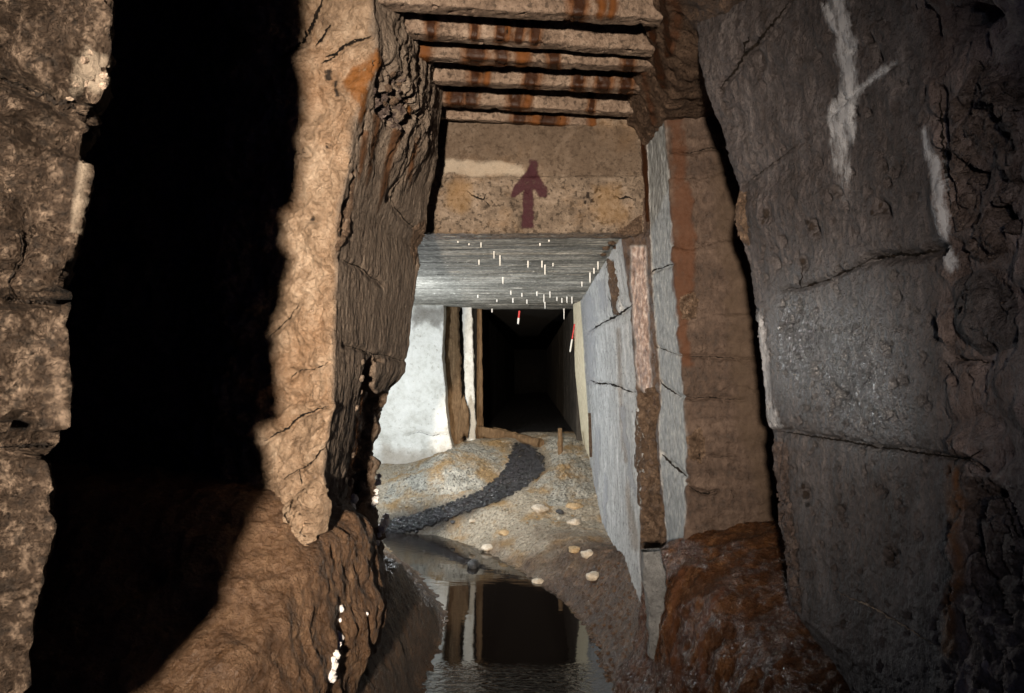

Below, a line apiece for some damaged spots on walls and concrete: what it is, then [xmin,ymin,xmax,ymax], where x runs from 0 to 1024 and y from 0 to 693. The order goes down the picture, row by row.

crack [279,0,371,63]
rust [419,14,437,61]
rust [345,51,381,121]
rust [447,16,568,127]
rust [568,0,680,127]
crack [782,249,940,291]
crack [588,299,633,332]
crack [590,380,632,393]
crack [265,407,324,441]
crack [284,449,323,484]
crack [775,431,985,471]